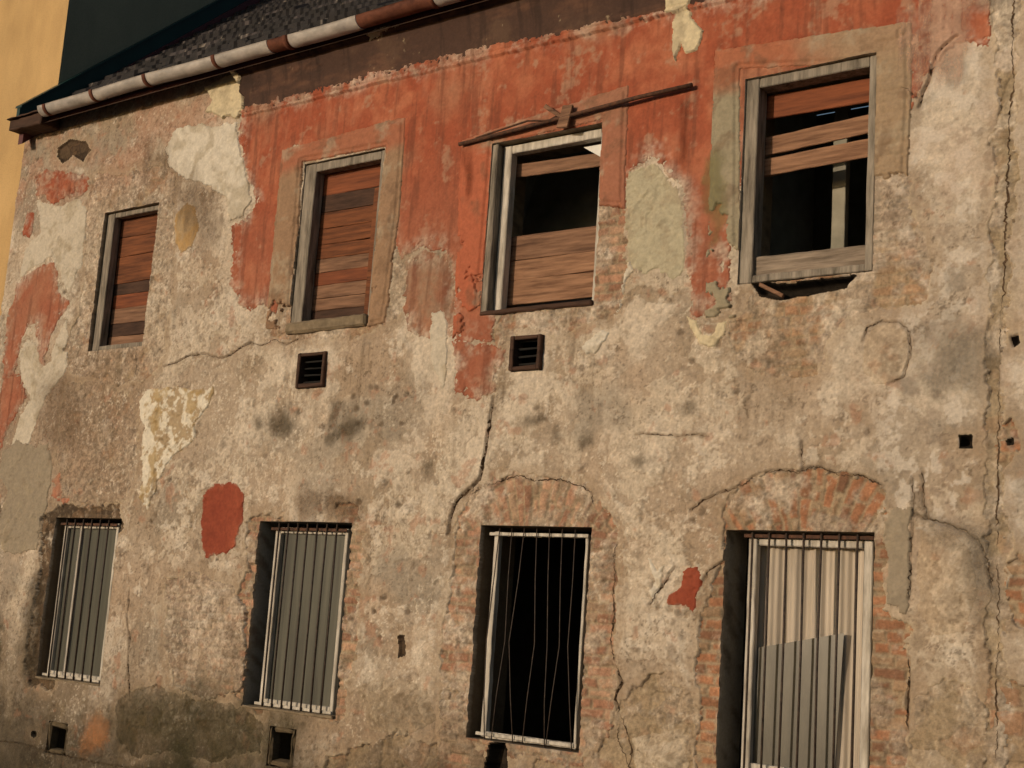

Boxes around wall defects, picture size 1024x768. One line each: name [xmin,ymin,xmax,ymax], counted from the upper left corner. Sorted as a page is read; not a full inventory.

flaking render [0,162,214,690]
flaking render [115,482,286,763]
crack [168,338,299,365]
crack [450,404,594,531]
flaking render [320,471,724,768]
peeling [165,0,936,401]
flaking render [723,0,1024,768]
crack [903,658,911,729]
crack [907,374,1001,767]
crack [999,0,1015,349]